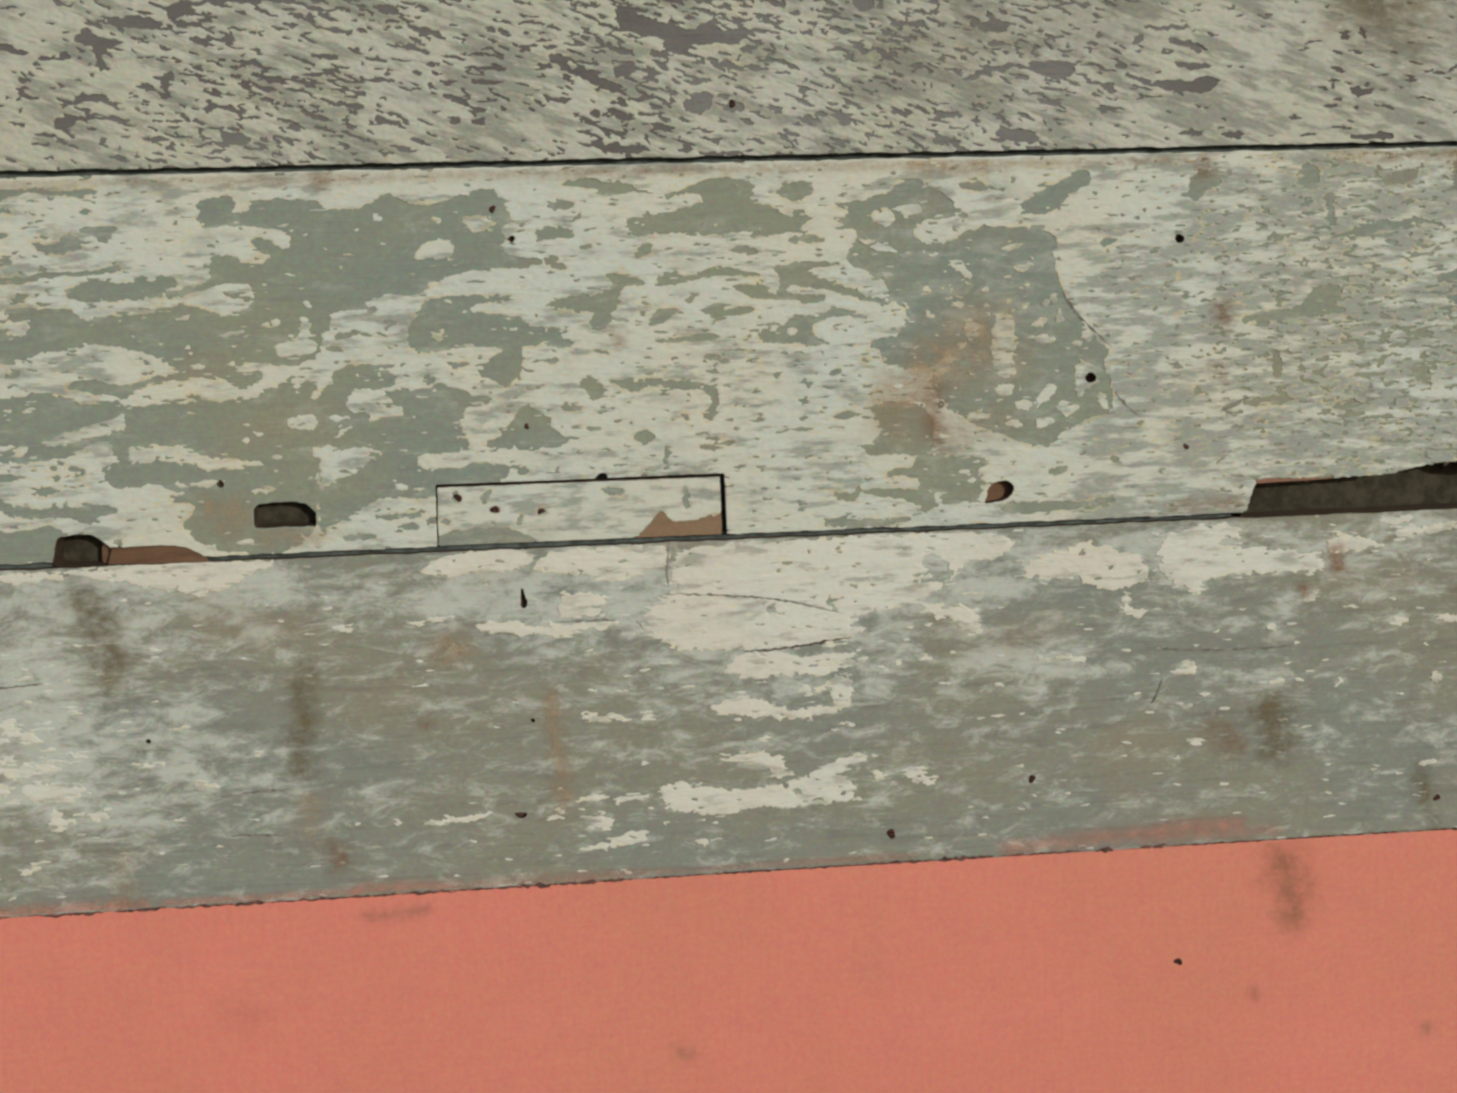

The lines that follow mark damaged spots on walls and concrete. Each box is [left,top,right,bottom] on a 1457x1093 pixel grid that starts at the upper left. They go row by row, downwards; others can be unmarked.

peeling [0,0,1457,851]
peeling [17,861,51,876]
crack [3,828,1457,919]